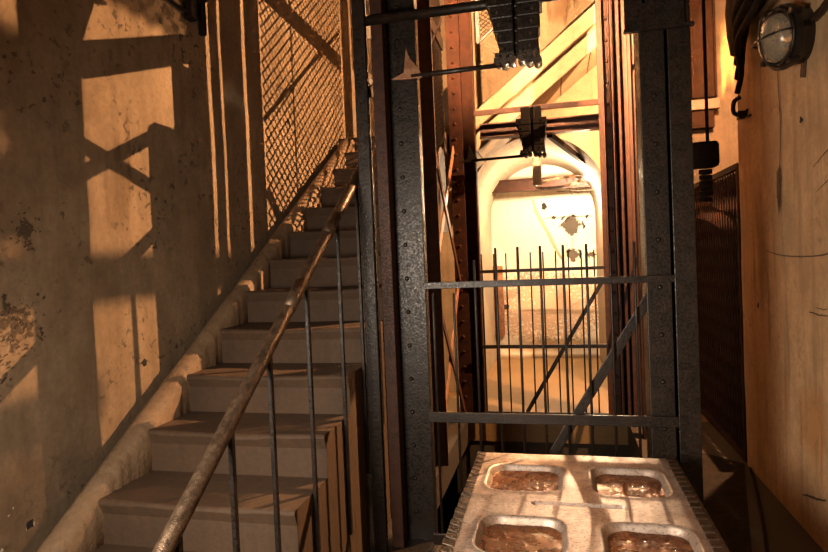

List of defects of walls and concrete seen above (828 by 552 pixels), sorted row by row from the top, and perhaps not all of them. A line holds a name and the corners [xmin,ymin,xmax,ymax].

spalling [540,203,589,236]
spalling [566,248,596,262]
peeling [0,292,52,384]